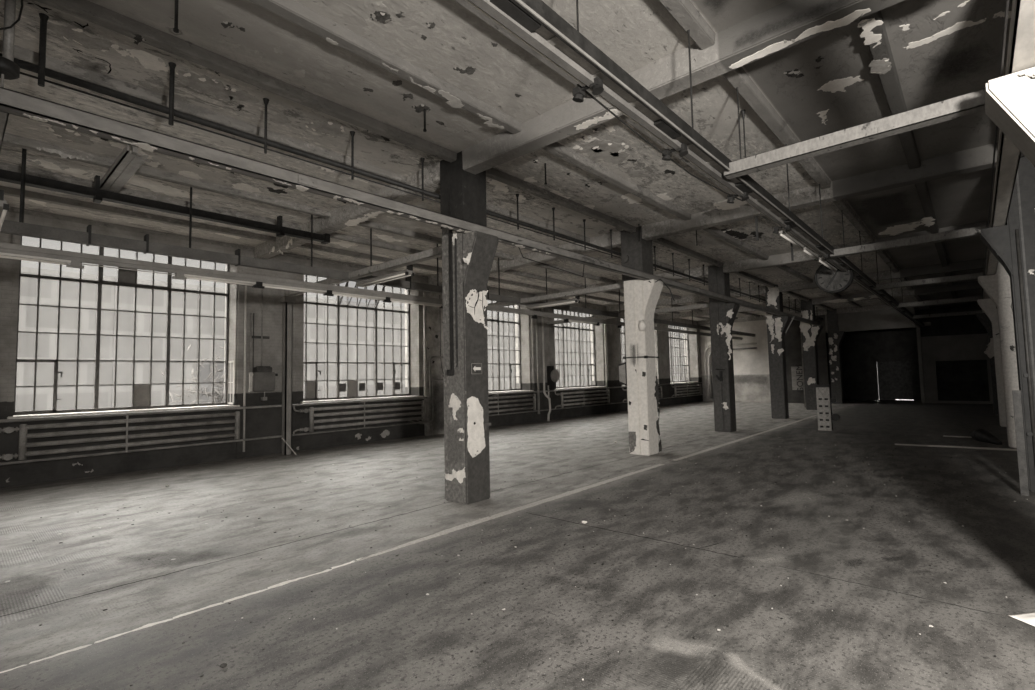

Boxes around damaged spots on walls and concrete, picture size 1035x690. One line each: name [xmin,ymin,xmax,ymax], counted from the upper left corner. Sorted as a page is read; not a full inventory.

peeling [900,0,1012,49]
peeling [729,8,892,93]
peeling [714,197,747,210]
peeling [878,217,935,236]
peeling [465,289,488,329]
peeling [717,310,734,360]
peeling [765,286,784,356]
peeling [799,310,839,382]
peeling [445,393,486,483]